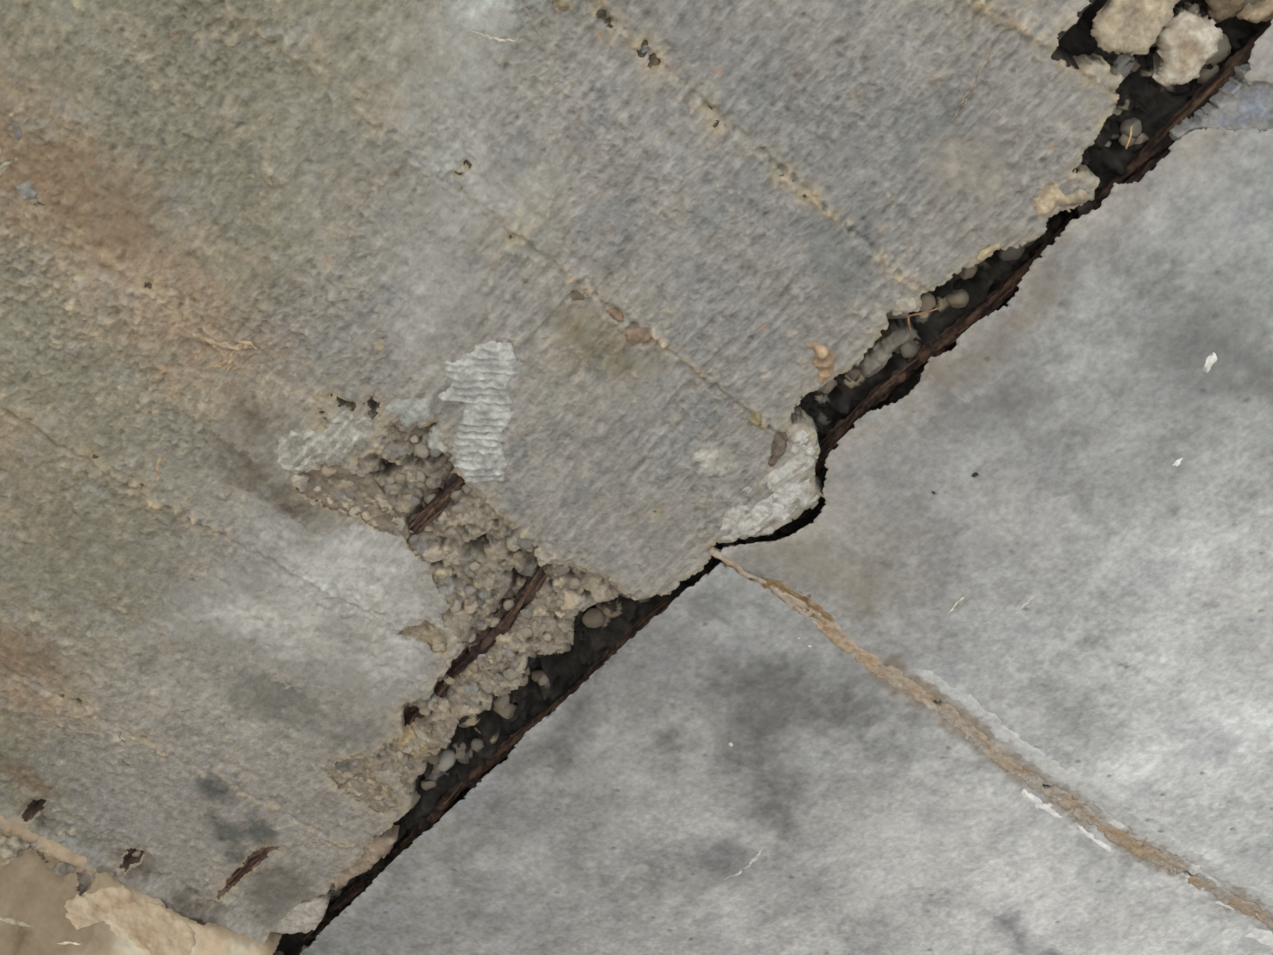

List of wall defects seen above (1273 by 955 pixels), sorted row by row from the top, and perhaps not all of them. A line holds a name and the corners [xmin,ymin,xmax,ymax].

spalling [1051,0,1094,70]
spalling [1173,0,1211,20]
spalling [815,19,1273,476]
crack [285,0,1268,932]
spalling [273,394,669,955]
hole [22,799,46,822]
flaking render [64,848,205,955]
spalling [210,846,279,901]